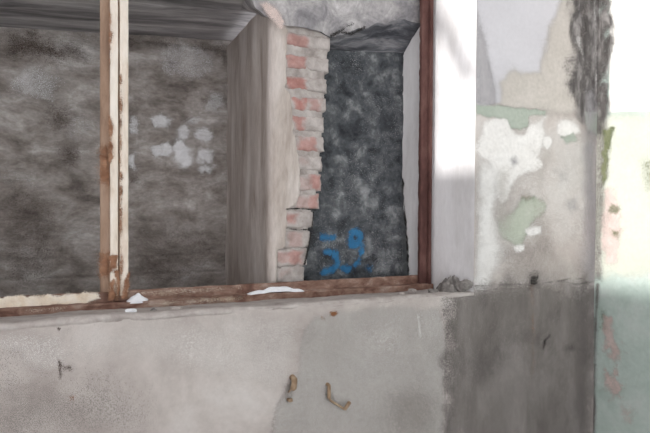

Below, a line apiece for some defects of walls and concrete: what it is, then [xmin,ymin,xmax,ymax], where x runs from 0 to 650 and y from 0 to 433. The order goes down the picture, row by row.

rust [95,75,125,234]
rust [94,248,131,301]
damp [437,0,616,433]
flaking render [473,103,625,297]